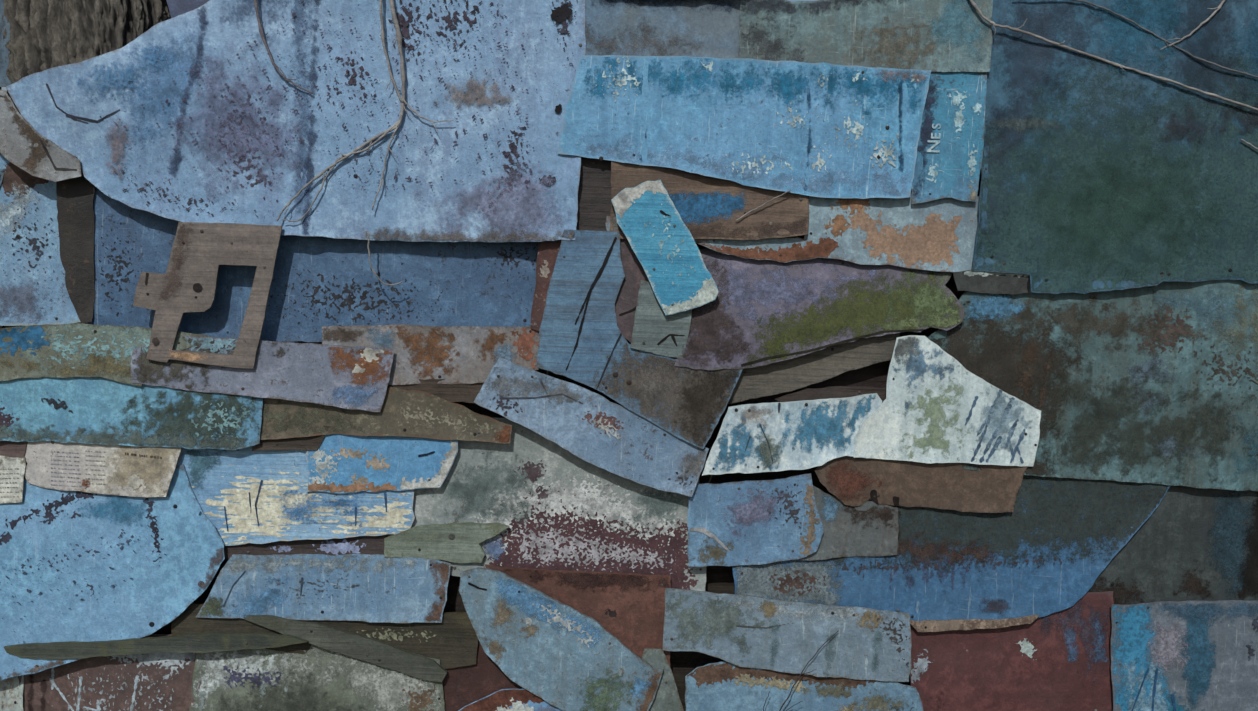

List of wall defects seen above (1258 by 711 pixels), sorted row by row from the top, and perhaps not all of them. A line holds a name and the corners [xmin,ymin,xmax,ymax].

peeling [612,180,718,314]
peeling [702,198,1029,278]
corrosion [268,257,462,389]
corrosion [683,260,749,367]
corrosion [475,329,594,442]
peeling [204,404,499,555]
corrosion [514,460,551,503]
corrosion [530,285,1258,668]
peeling [460,689,545,711]